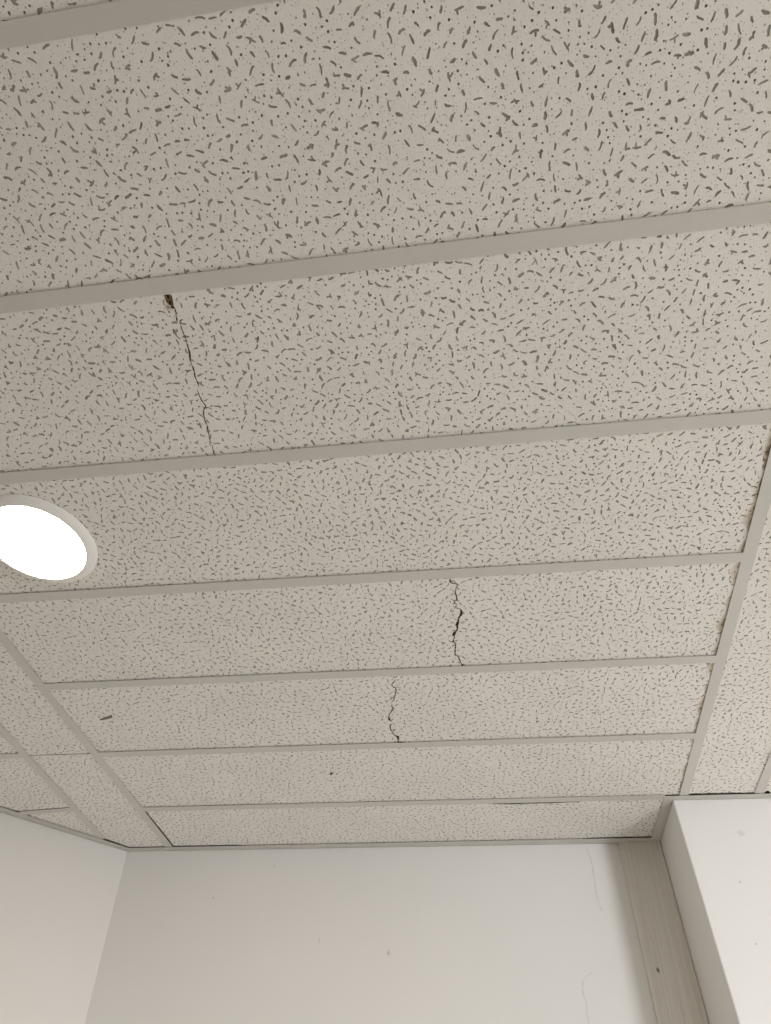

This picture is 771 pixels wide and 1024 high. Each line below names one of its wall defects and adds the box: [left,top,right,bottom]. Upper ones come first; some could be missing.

crack [173,308,214,453]
crack [449,578,464,666]
crack [388,676,403,743]